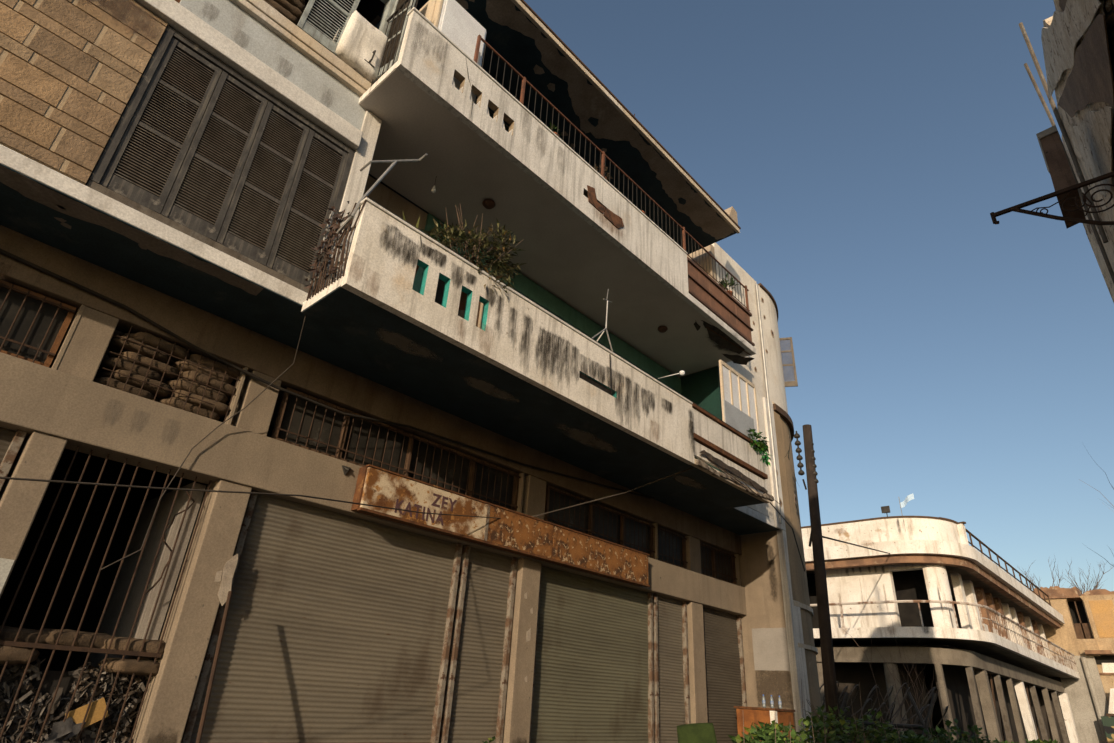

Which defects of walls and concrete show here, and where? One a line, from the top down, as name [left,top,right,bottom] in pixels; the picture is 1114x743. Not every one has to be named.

peeling [456,0,734,240]
flaking render [1057,13,1114,118]
damp [384,226,476,286]
damp [487,289,672,413]